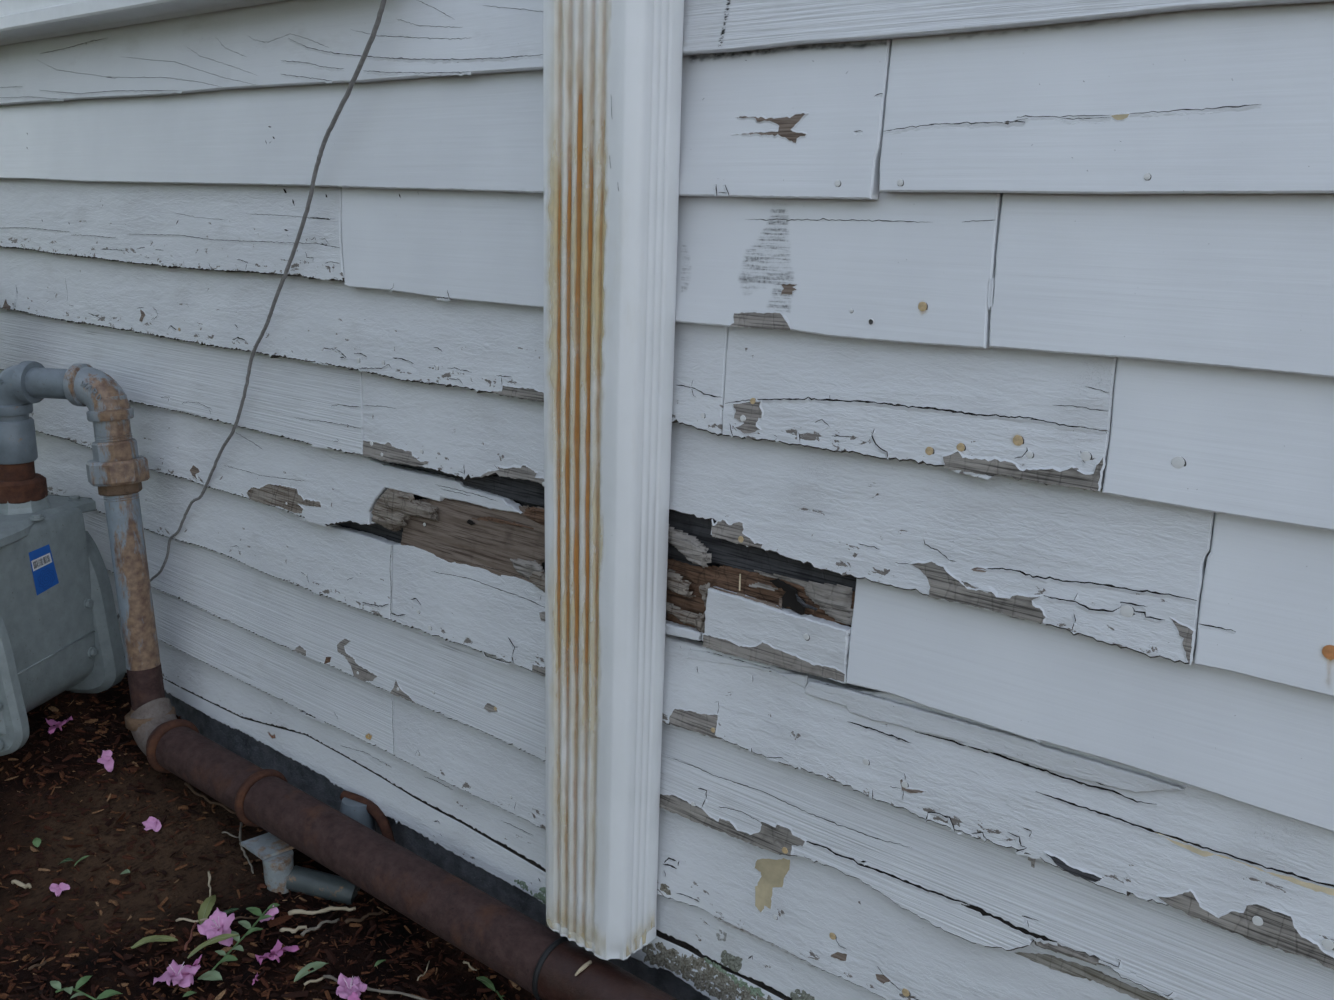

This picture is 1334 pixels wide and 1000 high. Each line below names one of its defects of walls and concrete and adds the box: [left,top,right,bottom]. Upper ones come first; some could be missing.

peeling [730,111,810,145]
crack [854,104,1262,136]
peeling [729,282,798,330]
rust [549,91,606,702]
peeling [941,449,1106,492]
peeling [246,483,322,515]
peeling [909,559,1047,624]
peeling [702,633,847,684]
peeling [668,707,721,739]
peeling [660,793,807,913]
peeling [1156,889,1334,970]
peeling [1016,952,1171,1000]